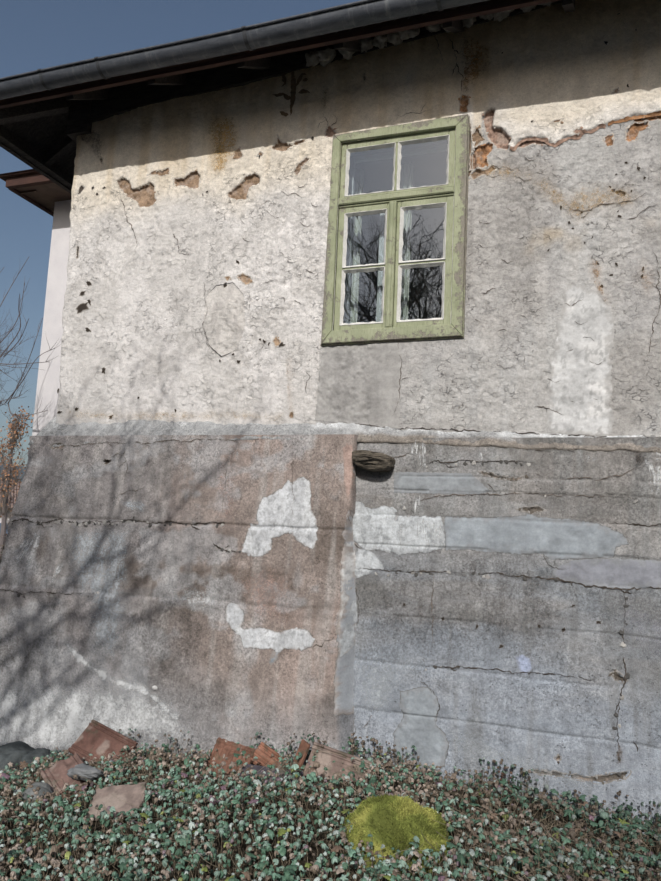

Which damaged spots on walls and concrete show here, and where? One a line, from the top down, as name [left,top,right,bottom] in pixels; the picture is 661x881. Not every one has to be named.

flaking render [458,95,661,185]
flaking render [116,168,208,208]
flaking render [226,172,261,201]
crack [649,255,661,352]
crack [9,438,277,554]
peeling [241,477,318,557]
peeling [342,443,445,578]
damp [634,451,661,491]
peeling [225,601,315,653]
crack [355,544,661,776]